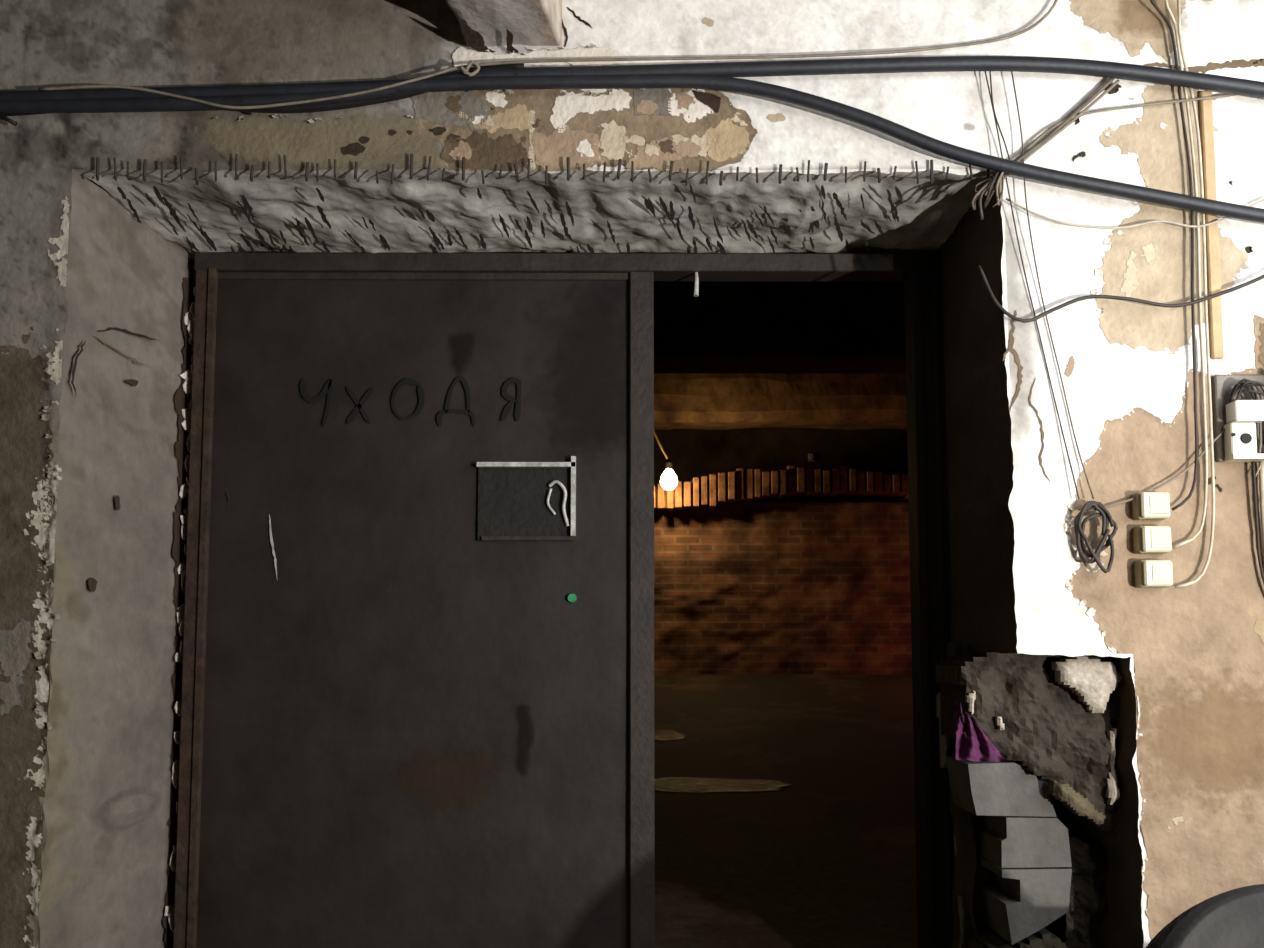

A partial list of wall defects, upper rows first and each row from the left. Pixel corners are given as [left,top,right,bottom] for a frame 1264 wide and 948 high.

peeling [1069,0,1186,65]
crack [1144,58,1264,73]
spalling [96,156,217,253]
peeling [204,88,758,253]
spalling [743,160,847,253]
spalling [860,161,902,254]
peeling [1090,83,1218,354]
peeling [1218,228,1255,296]
flaking render [1064,356,1075,377]
peeling [1228,314,1264,375]
peeling [0,327,61,948]
peeling [1064,369,1264,939]